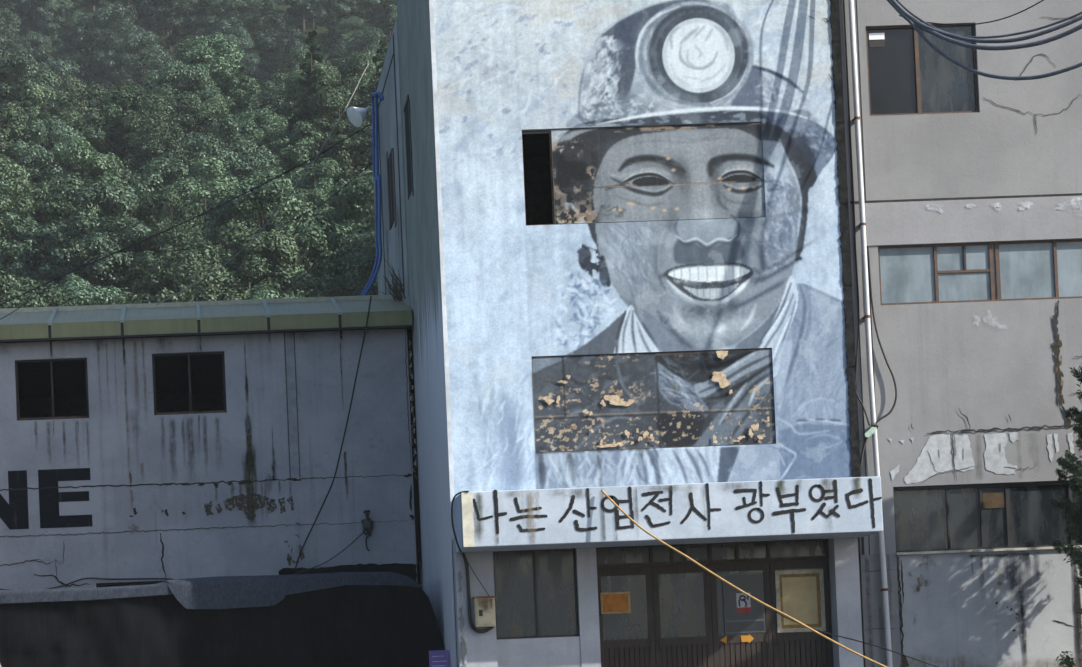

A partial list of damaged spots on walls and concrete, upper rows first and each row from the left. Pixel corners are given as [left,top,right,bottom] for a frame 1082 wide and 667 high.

crack [1016,53,1056,81]
crack [983,94,1080,134]
crack [911,301,1082,480]
water stain [232,420,256,522]
peeling [888,432,1020,484]
peeling [1047,432,1075,462]
peeling [163,481,294,521]
crack [0,520,406,587]
water stain [969,553,1039,657]